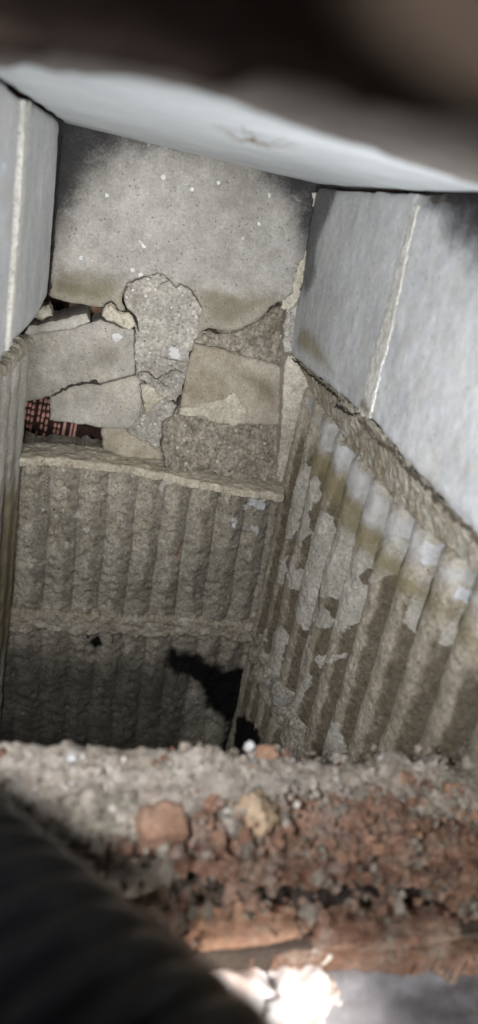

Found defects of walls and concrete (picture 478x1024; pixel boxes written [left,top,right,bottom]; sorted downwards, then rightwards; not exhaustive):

crack [101,265,281,334]
crack [52,358,184,411]
crack [292,358,478,545]
peeling [277,462,446,714]
peeling [438,585,472,646]
peeling [260,625,289,676]
peeling [320,718,348,765]